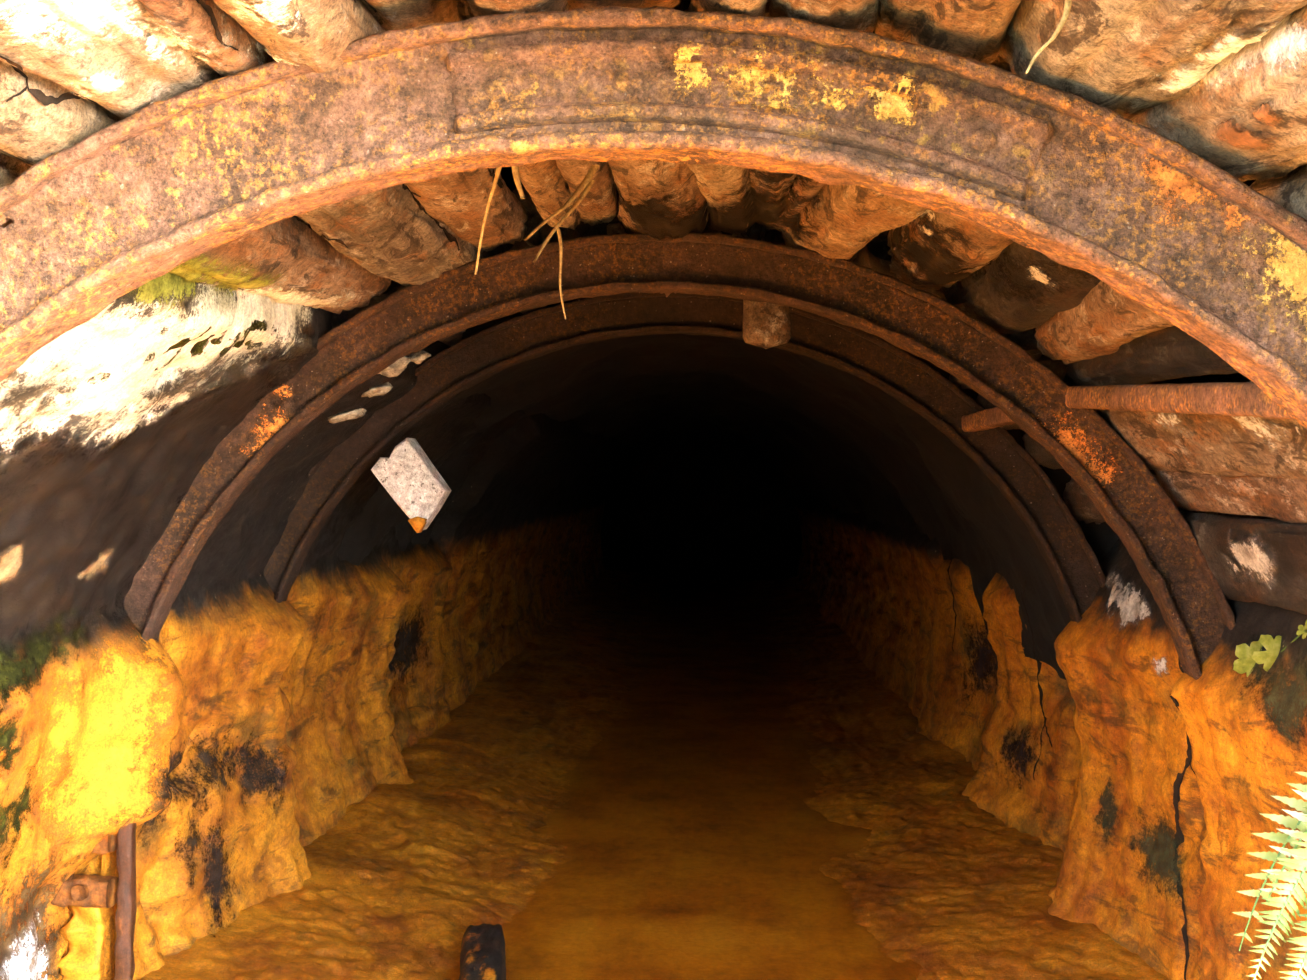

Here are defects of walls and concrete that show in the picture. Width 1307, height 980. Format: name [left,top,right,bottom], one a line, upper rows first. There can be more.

rust [673,39,916,126]
rust [1135,148,1307,355]
rust [238,383,293,459]
rust [1037,411,1123,488]
crack [1170,657,1196,980]
damp [0,848,85,980]
rust [55,906,73,979]